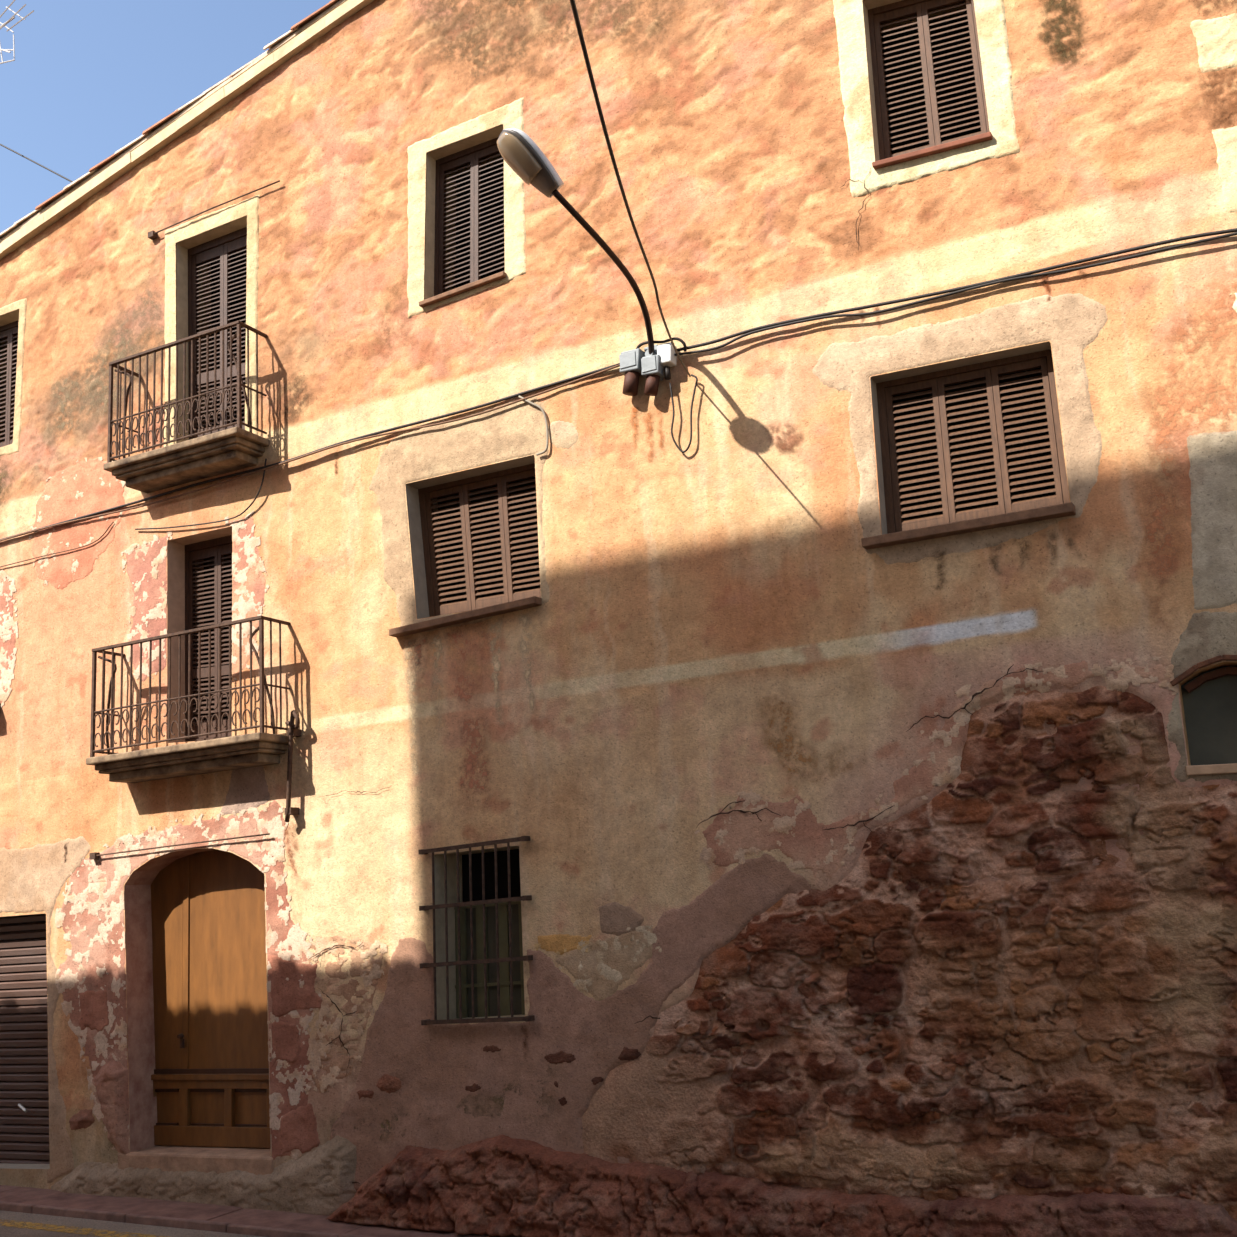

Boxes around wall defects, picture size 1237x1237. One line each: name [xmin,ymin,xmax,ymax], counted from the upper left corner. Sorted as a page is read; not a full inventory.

water stain [1044,0,1080,63]
peeling [0,570,18,709]
peeling [29,456,172,682]
peeling [224,511,269,680]
crack [906,664,1043,732]
crack [696,800,781,828]
peeling [55,800,387,1160]
peeling [534,934,592,955]
spalling [582,657,1237,1221]
spalling [357,1074,402,1099]